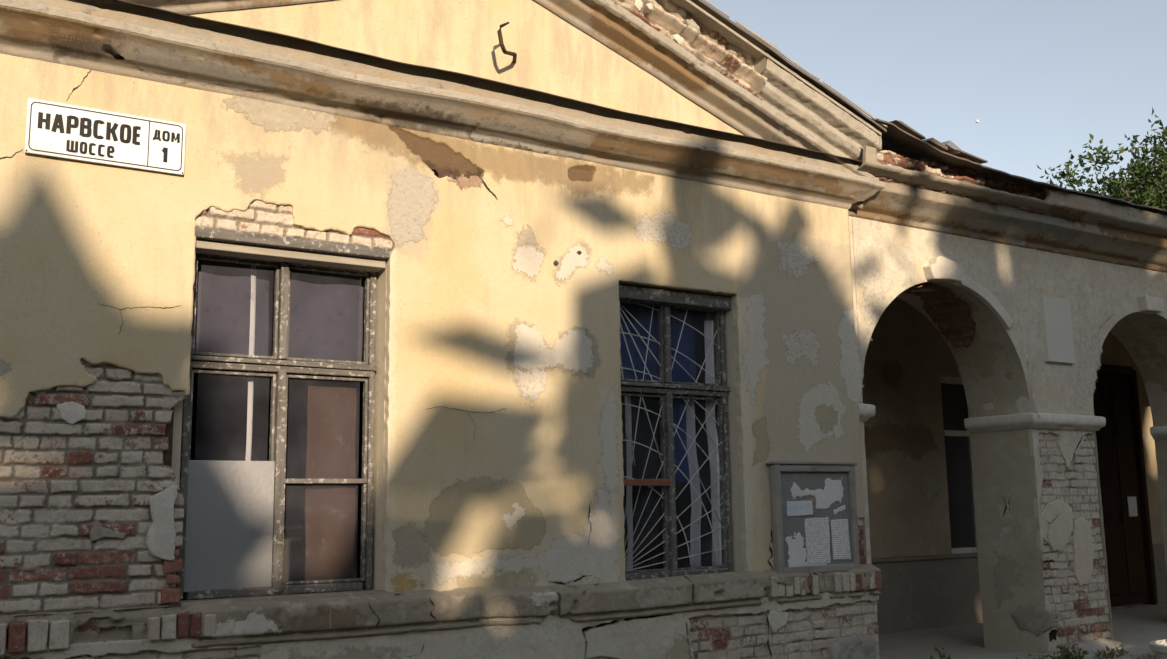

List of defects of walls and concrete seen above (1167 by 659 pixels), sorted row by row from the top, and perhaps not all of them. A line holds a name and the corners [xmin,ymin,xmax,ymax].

peeling [633,209,694,251]
crack [98,303,181,334]
peeling [506,321,600,408]
peeling [797,269,976,452]
spalling [0,359,283,659]
leakage [424,477,546,558]
spalling [633,518,881,659]
spalling [1010,432,1111,646]